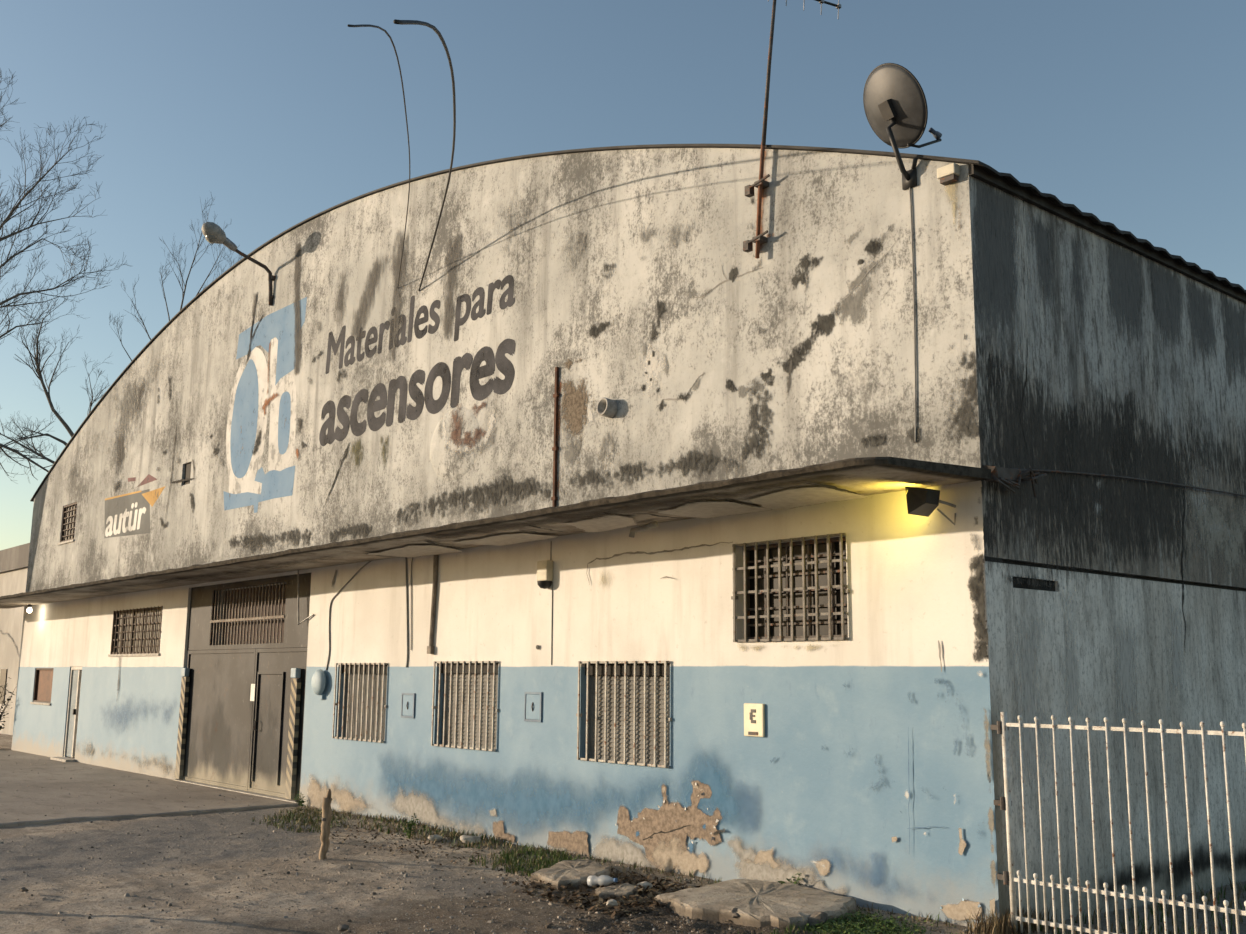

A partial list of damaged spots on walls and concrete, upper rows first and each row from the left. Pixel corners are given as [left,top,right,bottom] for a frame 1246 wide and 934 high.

damp [294,243,323,383]
damp [335,233,408,361]
damp [70,359,171,477]
damp [393,224,893,540]
damp [907,427,920,443]
damp [949,179,1246,662]
damp [229,529,313,554]
damp [329,523,372,543]
damp [1012,621,1046,781]
peeling [489,809,515,842]
peeling [547,780,845,896]
peeling [940,807,997,928]